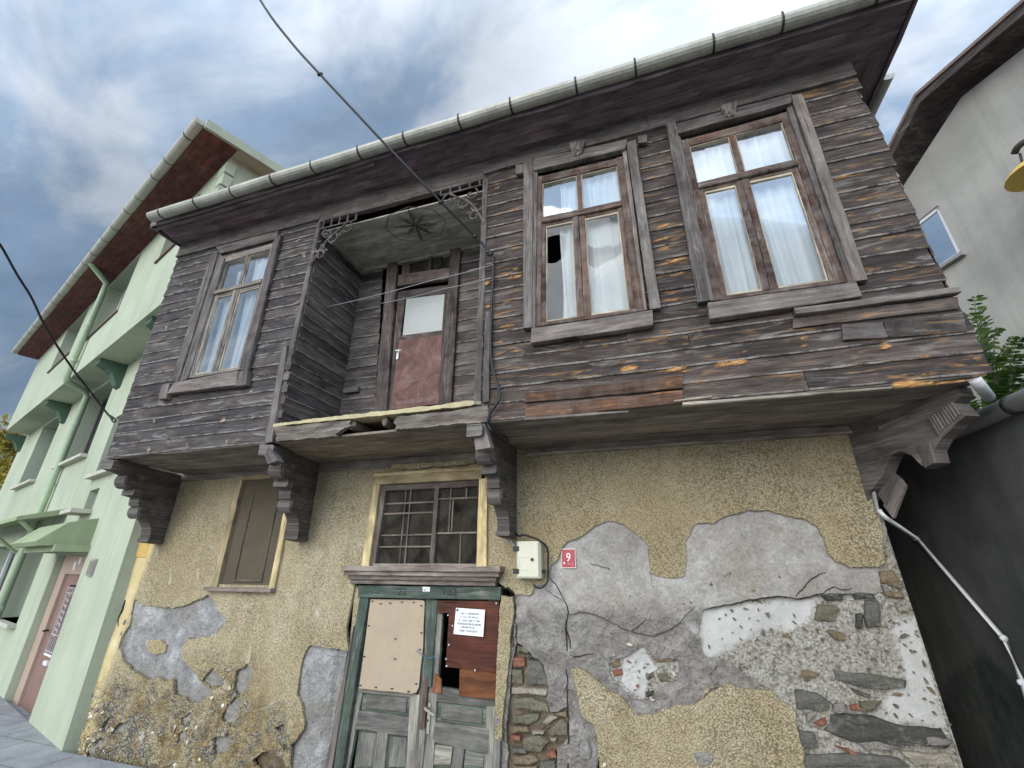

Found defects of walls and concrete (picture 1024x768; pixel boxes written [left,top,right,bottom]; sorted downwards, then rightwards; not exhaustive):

peeling [892,374,966,388]
flaking render [879,517,889,557]
flaking render [78,595,253,768]
flaking render [257,631,351,768]
flaking render [501,510,880,768]
crack [547,572,851,768]